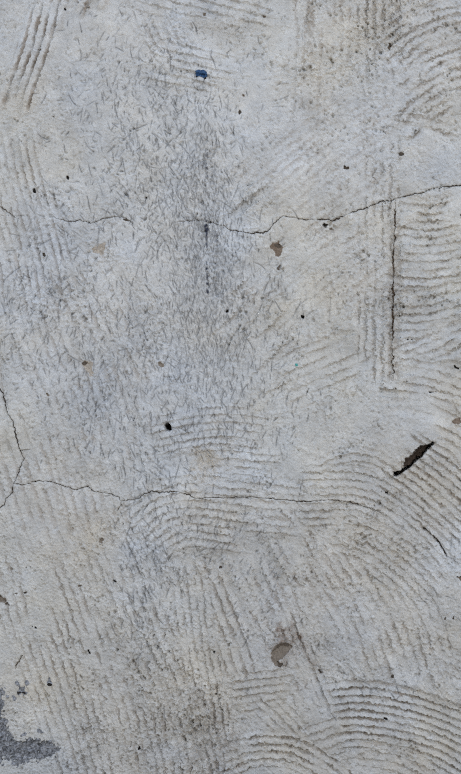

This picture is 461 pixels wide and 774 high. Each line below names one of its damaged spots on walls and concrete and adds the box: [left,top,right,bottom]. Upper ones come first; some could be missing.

crack [56,216,134,228]
crack [178,185,461,373]
crack [0,389,377,511]
spalling [403,445,428,467]
spalling [0,680,63,768]